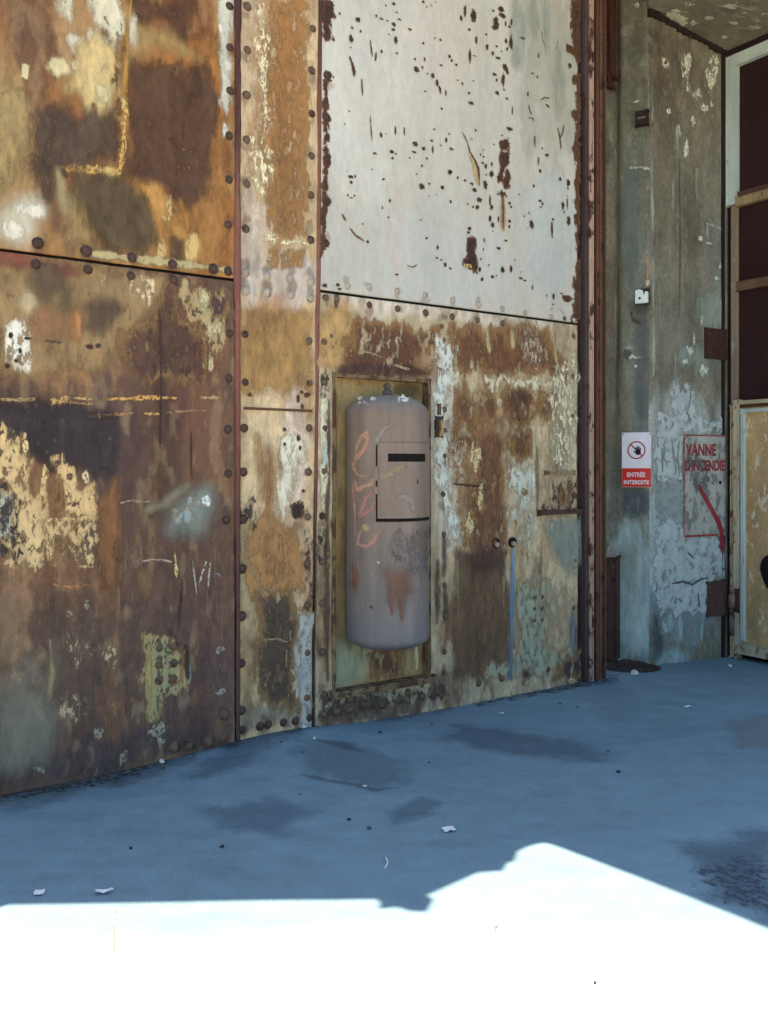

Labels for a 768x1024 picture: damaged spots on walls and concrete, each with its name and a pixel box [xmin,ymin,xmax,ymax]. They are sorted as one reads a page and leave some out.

corrosion [0,0,227,268]
peeling [246,2,276,198]
corrosion [259,0,337,270]
corrosion [462,227,481,274]
corrosion [497,137,512,230]
corrosion [562,0,582,323]
peeling [0,422,100,573]
corrosion [240,308,569,721]
peeling [428,333,463,544]
peeling [484,353,580,551]
flaking render [651,377,725,641]
peeling [137,632,190,749]